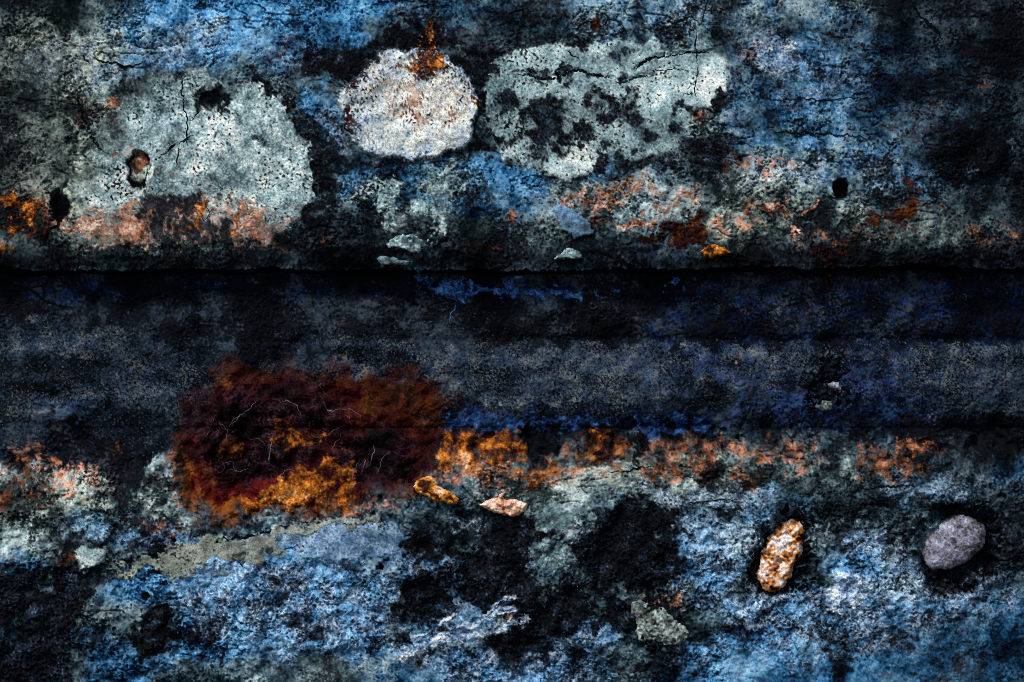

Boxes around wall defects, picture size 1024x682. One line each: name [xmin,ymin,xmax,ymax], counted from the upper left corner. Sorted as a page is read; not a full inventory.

corrosion [397,15,448,82]
crack [514,1,715,106]
crack [73,96,109,152]
crack [141,76,204,169]
mould [191,82,233,118]
damp [250,67,337,229]
damp [293,18,743,176]
corrosion [60,194,292,253]
corrosion [555,169,712,249]
corrosion [170,359,712,527]
corrosion [852,436,934,480]
flaking render [74,511,408,579]